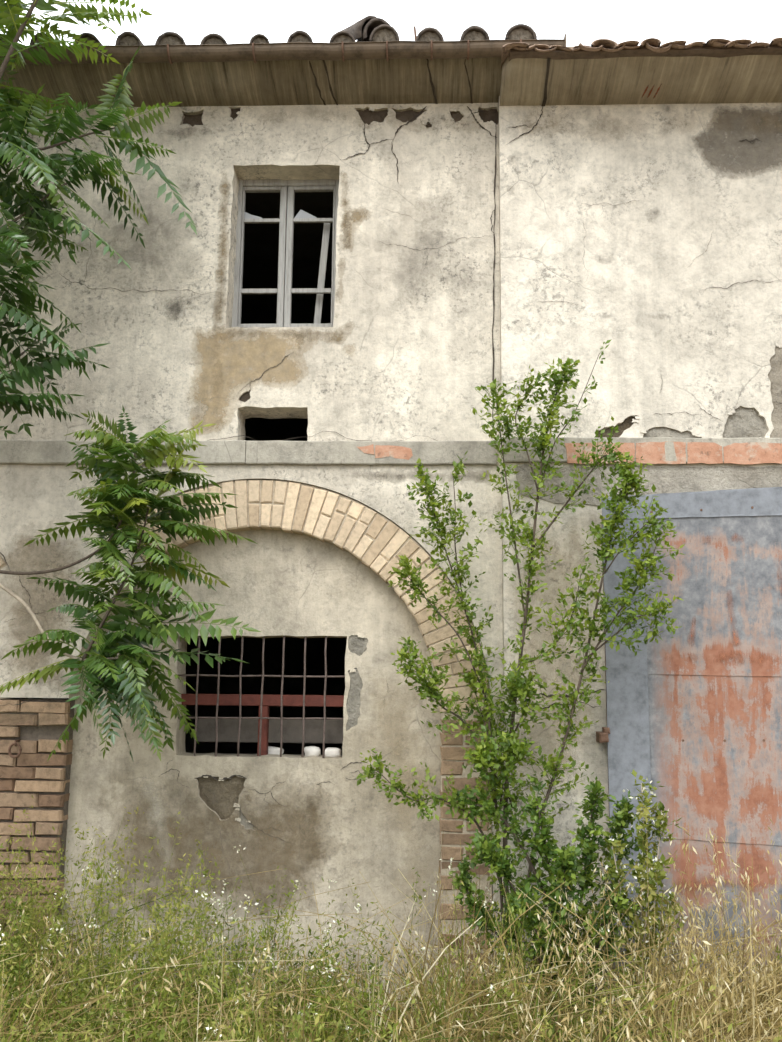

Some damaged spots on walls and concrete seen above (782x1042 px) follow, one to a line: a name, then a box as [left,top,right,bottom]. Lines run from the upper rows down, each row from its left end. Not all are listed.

flaking render [183,111,203,127]
crack [340,59,438,182]
flaking render [356,106,432,128]
leakage [694,108,782,174]
crack [379,57,550,439]
flaking render [565,346,782,465]
flaking render [357,444,413,460]
flaking render [197,774,255,830]